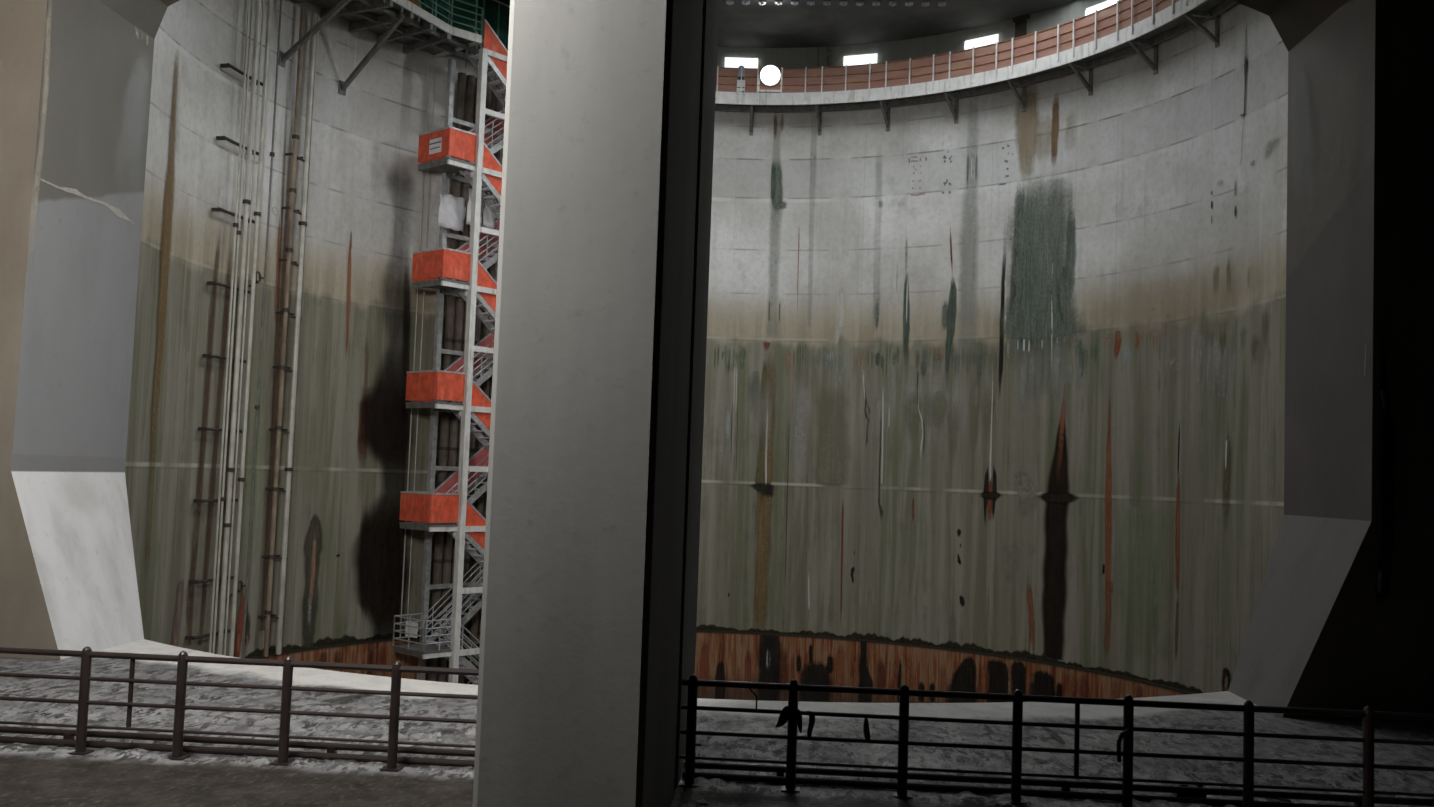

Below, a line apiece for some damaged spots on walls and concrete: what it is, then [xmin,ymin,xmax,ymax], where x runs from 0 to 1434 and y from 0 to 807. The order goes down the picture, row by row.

leakage [245,283,430,658]
leakage [696,155,1203,694]
rust [1103,419,1113,646]
leakage [1222,668,1230,691]